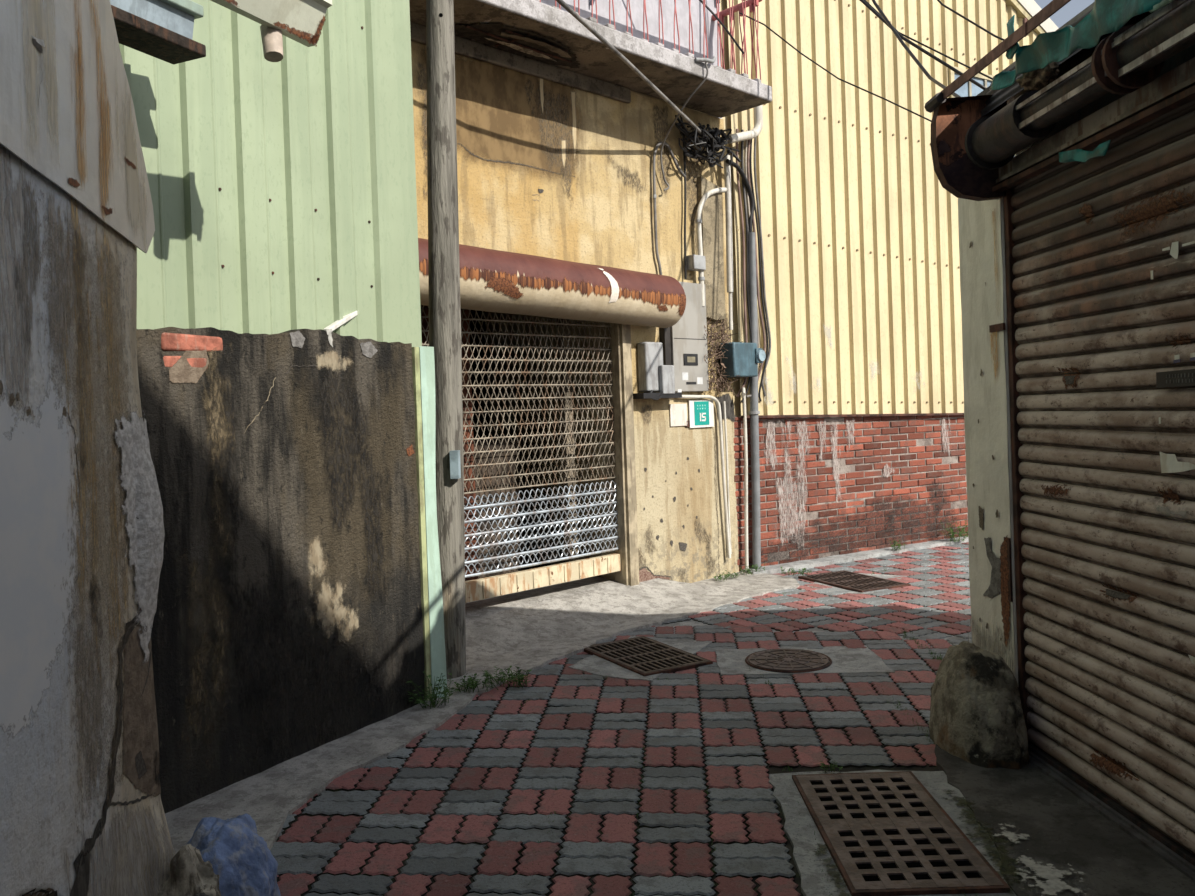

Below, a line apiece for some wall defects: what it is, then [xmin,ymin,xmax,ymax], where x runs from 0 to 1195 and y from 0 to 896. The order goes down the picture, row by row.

corrosion [273,14,327,46]
corrosion [937,140,1005,274]
corrosion [419,258,428,276]
corrosion [460,266,686,318]
water stain [0,151,133,816]
water stain [748,417,963,565]
water stain [180,350,416,778]
flaking render [309,538,359,641]
corrosion [1000,535,1010,647]
crack [74,580,161,876]
flaking render [22,807,174,896]